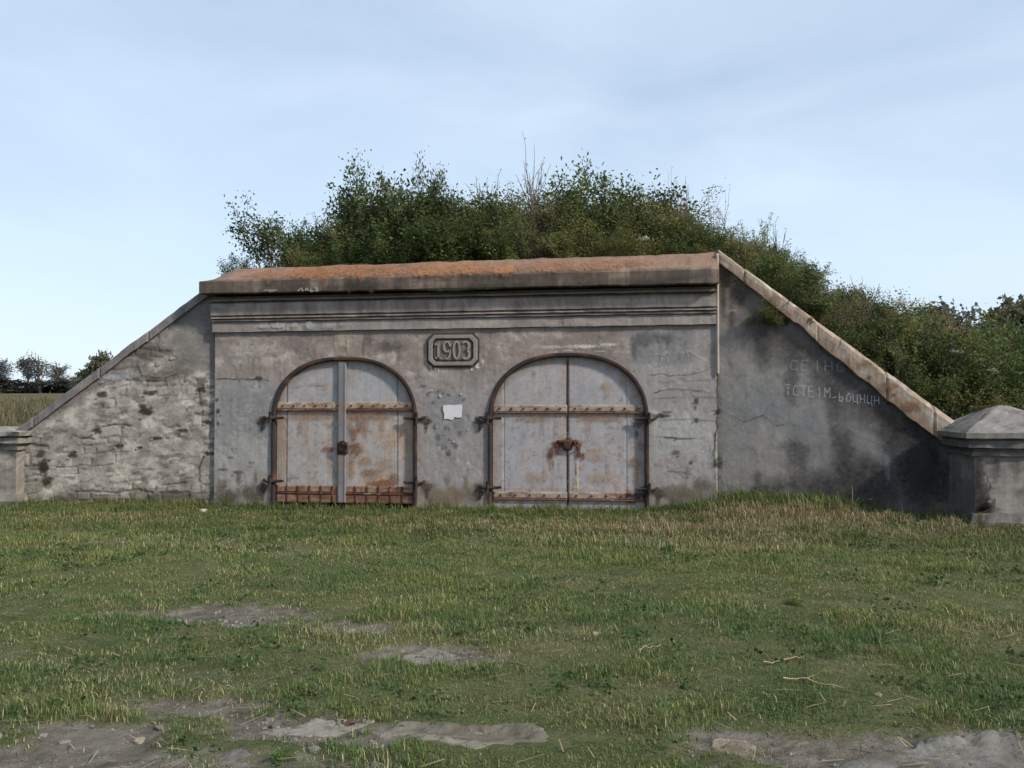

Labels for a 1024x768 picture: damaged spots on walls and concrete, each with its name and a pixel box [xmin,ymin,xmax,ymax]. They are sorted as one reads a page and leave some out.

rust [349,412,399,486]
rust [543,423,584,489]
crack [651,368,794,462]
water stain [786,390,949,504]